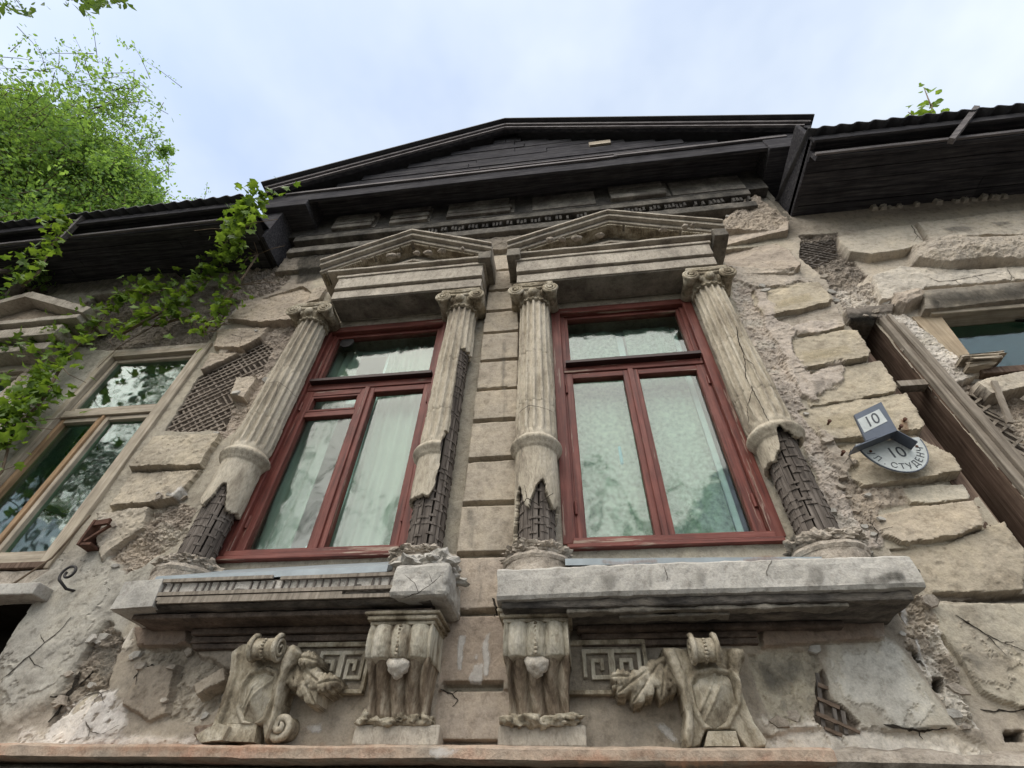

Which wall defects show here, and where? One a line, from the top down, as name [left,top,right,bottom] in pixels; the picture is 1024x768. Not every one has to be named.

spalling [213,319,296,440]
crack [736,326,769,421]
spalling [731,273,911,555]
spalling [798,231,982,396]
spalling [985,392,1024,446]
crack [1,617,71,680]
spalling [32,620,230,744]
crack [956,615,1024,656]